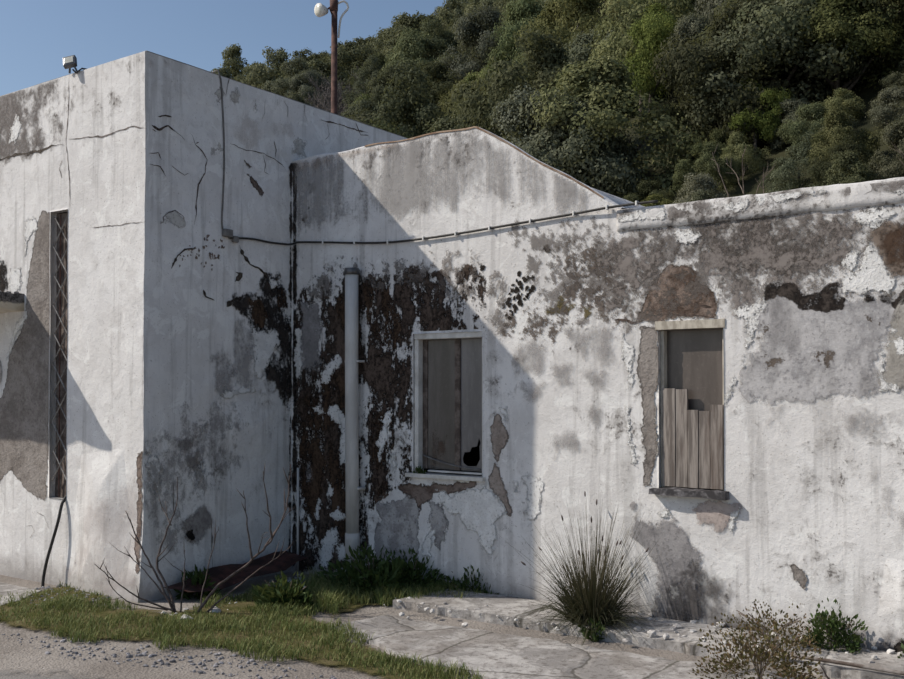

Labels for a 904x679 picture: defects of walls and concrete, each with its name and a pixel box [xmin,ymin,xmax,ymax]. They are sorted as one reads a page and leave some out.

crack [0,82,207,224]
crack [232,142,284,174]
water stain [364,132,509,219]
peeling [853,205,904,231]
crack [203,245,272,307]
peeling [840,245,896,296]
spalling [0,210,49,501]
water stain [212,155,904,573]
peeling [313,404,345,465]
peeling [314,479,346,568]
peeling [374,407,544,566]
spalling [789,564,807,589]